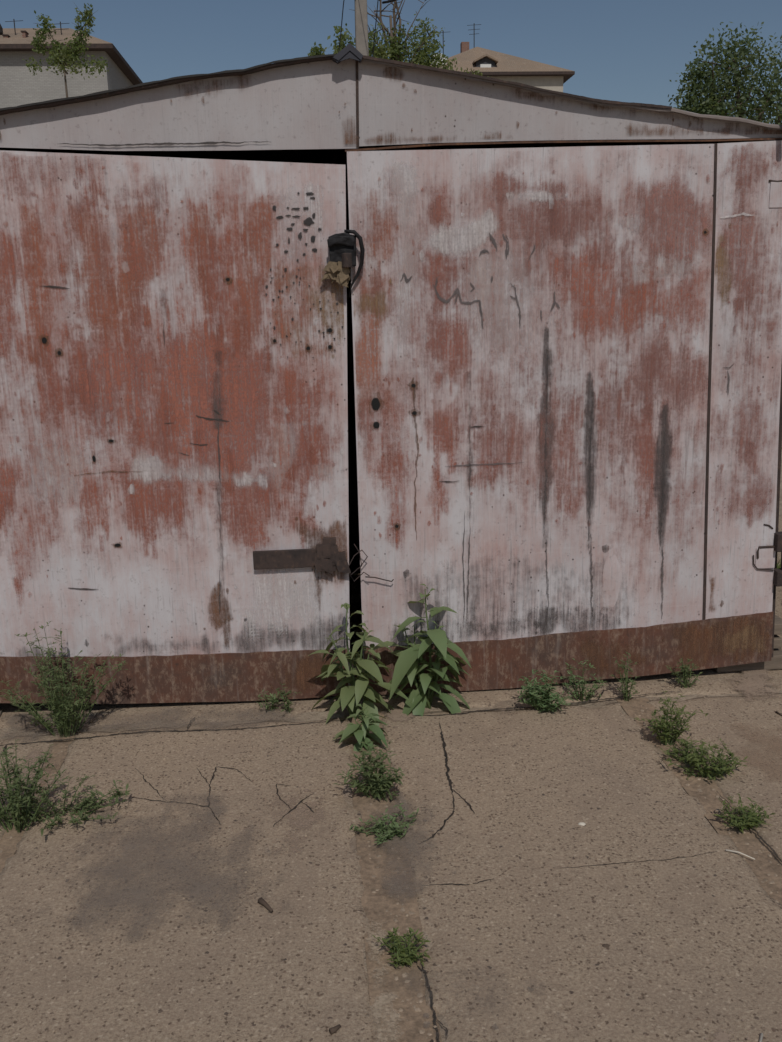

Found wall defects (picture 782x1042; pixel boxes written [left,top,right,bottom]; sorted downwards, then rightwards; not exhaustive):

corrosion [265,262,345,351]
damp [539,329,554,524]
damp [585,373,595,617]
damp [655,406,672,615]
corrosion [295,517,348,602]
corrosion [204,583,231,646]
crack [96,767,251,824]
crack [273,784,314,827]
crack [413,691,679,844]
crack [717,791,782,862]
crack [414,935,448,1042]